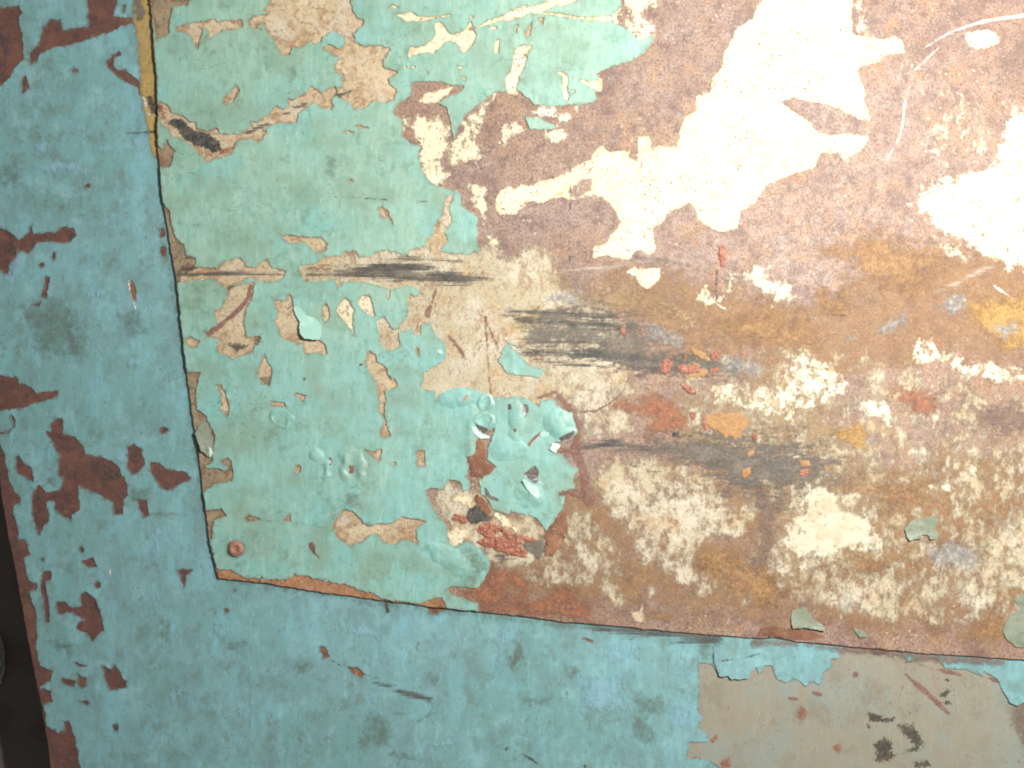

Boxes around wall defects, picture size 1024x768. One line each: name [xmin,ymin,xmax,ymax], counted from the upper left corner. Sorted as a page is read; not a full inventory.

peeling [964,30,1000,50]
water stain [306,256,466,282]
peeling [132,0,905,467]
corrosion [212,0,1024,663]
water stain [512,294,760,375]
peeling [907,90,1024,273]
peeling [187,372,234,493]
peeling [333,510,425,546]
peeling [522,479,539,498]
peeling [432,482,655,622]
peeling [590,338,1024,648]
peeling [687,628,1024,768]